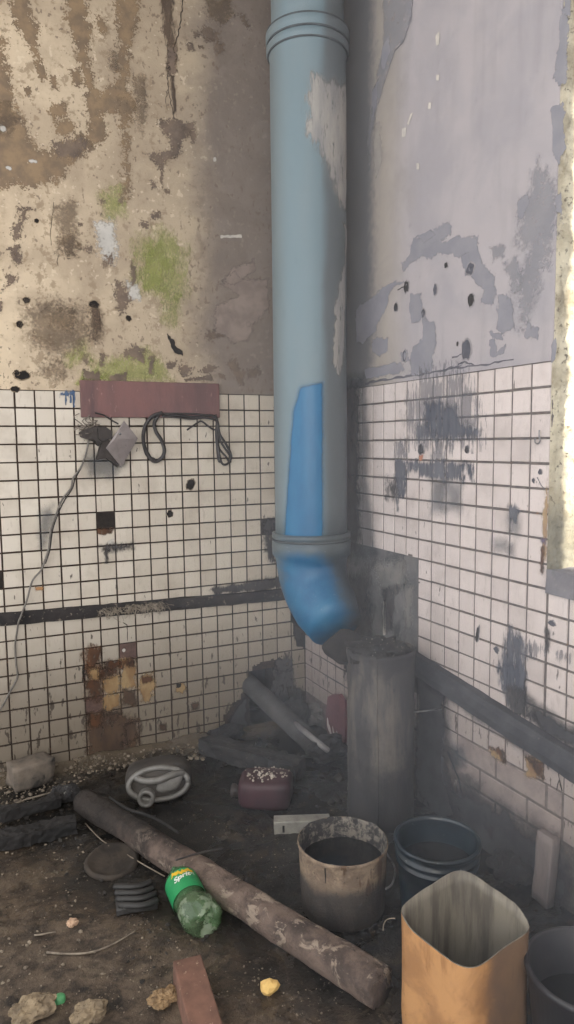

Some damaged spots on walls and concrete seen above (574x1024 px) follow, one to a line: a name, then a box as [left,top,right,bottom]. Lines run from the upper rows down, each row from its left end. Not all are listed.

crack [165,0,183,118]
peeling [367,0,412,174]
spalling [553,0,571,86]
peeling [355,102,566,379]
water stain [23,299,104,379]
water stain [416,397,481,444]
water stain [385,458,474,500]
peeling [96,512,115,544]
corrosion [80,643,155,711]
water stain [498,661,574,749]